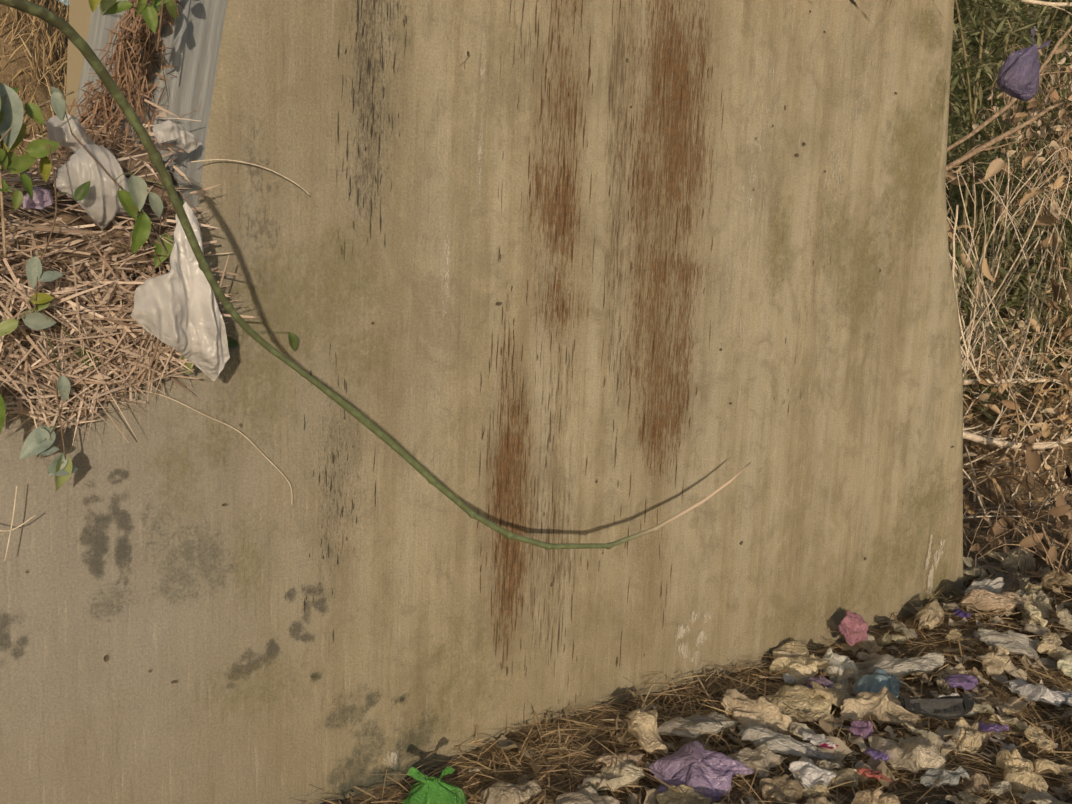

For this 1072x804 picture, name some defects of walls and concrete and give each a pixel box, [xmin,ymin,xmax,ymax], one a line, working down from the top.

damp [338,0,407,245]
corrosion [521,0,595,383]
corrosion [621,0,723,494]
damp [81,507,131,576]
damp [309,410,357,564]
corrosion [477,329,535,667]
damp [340,734,422,796]